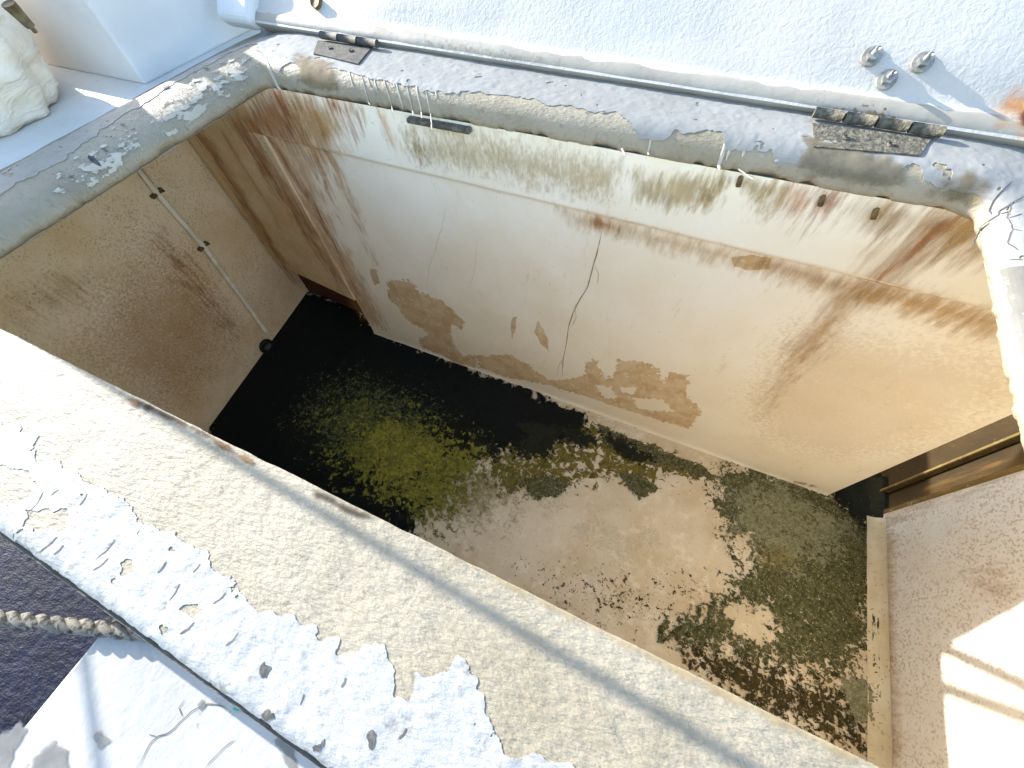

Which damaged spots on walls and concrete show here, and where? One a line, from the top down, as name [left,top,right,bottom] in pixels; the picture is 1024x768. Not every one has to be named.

rust [233,93,311,238]
peeling [0,29,1024,373]
mould [208,291,656,535]
peeling [370,269,702,429]
crack [557,223,604,374]
peeling [0,423,574,768]
mould [500,552,704,640]